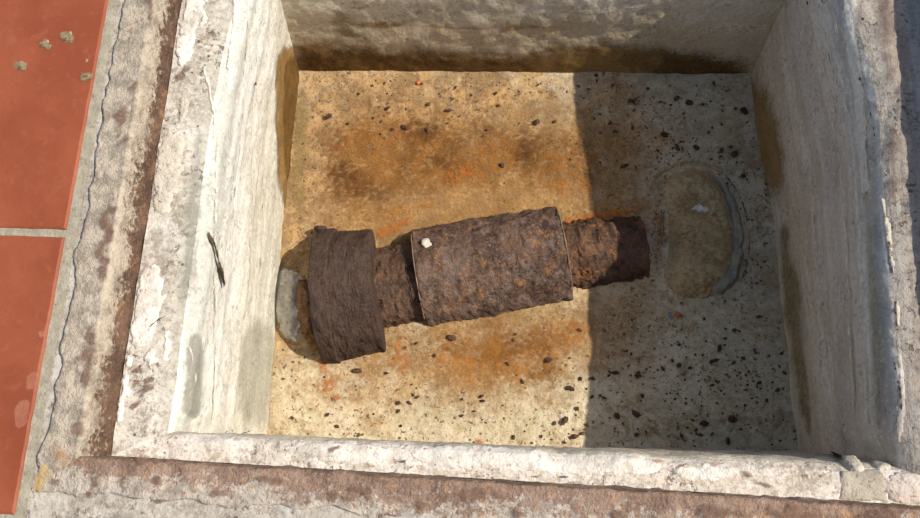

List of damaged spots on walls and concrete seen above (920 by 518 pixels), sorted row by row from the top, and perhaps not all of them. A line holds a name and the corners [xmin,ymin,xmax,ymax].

corrosion [327,116,644,244]
water stain [268,14,747,207]
water stain [751,84,783,197]
corrosion [369,314,615,388]